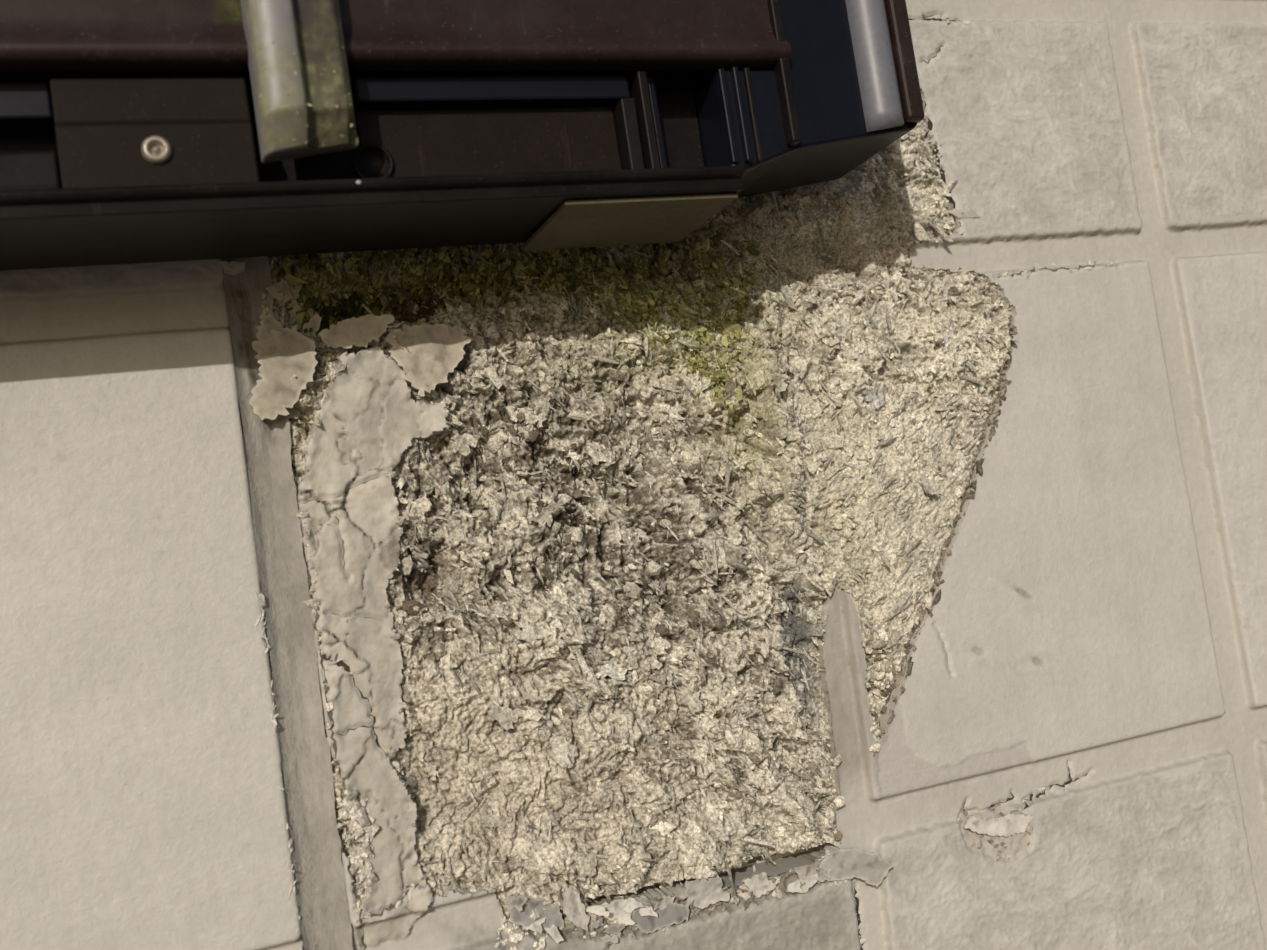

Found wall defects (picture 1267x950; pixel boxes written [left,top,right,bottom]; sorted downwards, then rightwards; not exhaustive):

crack [995,260,1123,278]
crack [302,475,381,576]
spalling [249,100,1019,950]
crack [304,554,418,950]
peeling [957,802,1033,861]